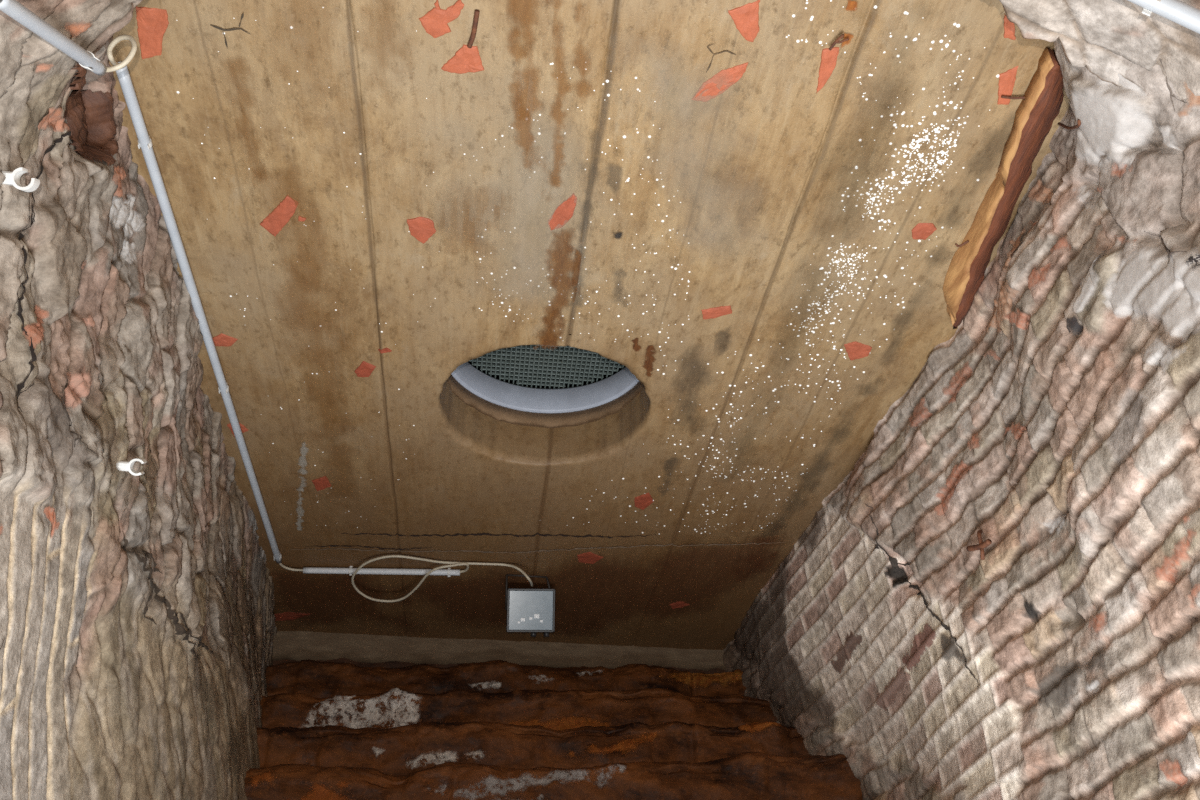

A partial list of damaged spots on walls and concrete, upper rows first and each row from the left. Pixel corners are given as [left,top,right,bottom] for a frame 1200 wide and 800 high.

spalling [419,0,464,38]
spalling [728,0,760,42]
spalling [441,44,484,74]
spalling [691,62,748,102]
spalling [816,47,839,93]
spalling [260,195,306,237]
spalling [407,217,436,244]
spalling [548,193,577,231]
corrosion [541,234,582,347]
crack [123,533,214,660]
crack [865,504,979,687]